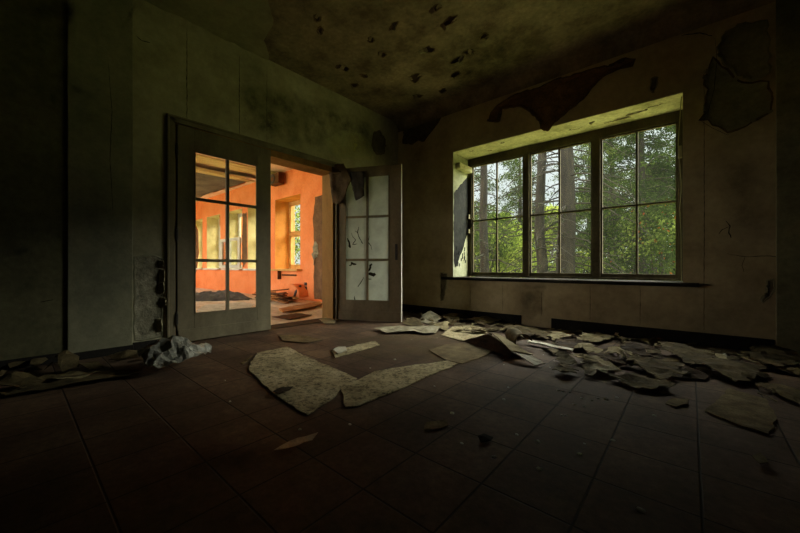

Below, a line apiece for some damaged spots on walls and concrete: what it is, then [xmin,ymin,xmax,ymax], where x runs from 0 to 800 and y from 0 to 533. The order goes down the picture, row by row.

flaking render [487,57,636,131]
peeling [453,176,468,267]
peeling [133,254,166,341]